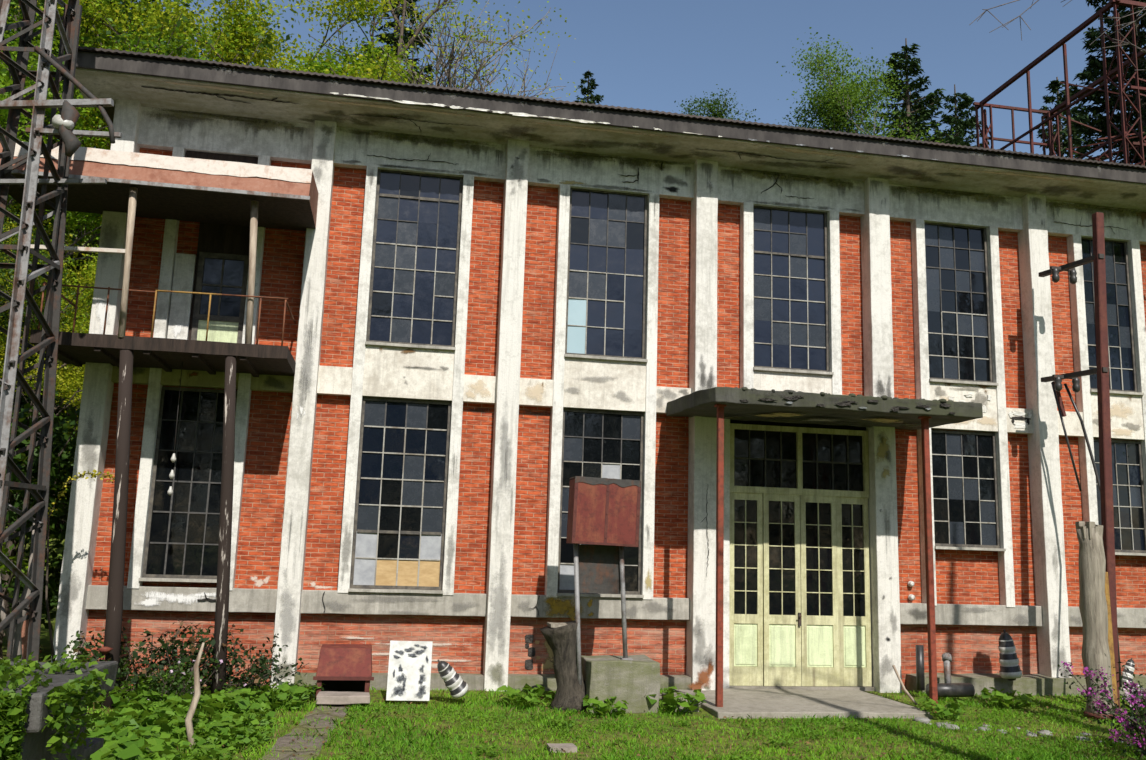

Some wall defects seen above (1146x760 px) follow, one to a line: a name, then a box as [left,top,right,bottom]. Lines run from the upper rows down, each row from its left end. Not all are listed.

crack [141,86,295,104]
damp [157,100,712,192]
damp [725,147,861,194]
damp [872,167,1146,224]
spalling [729,386,996,477]
spalling [1009,411,1032,429]
peeling [141,592,216,606]